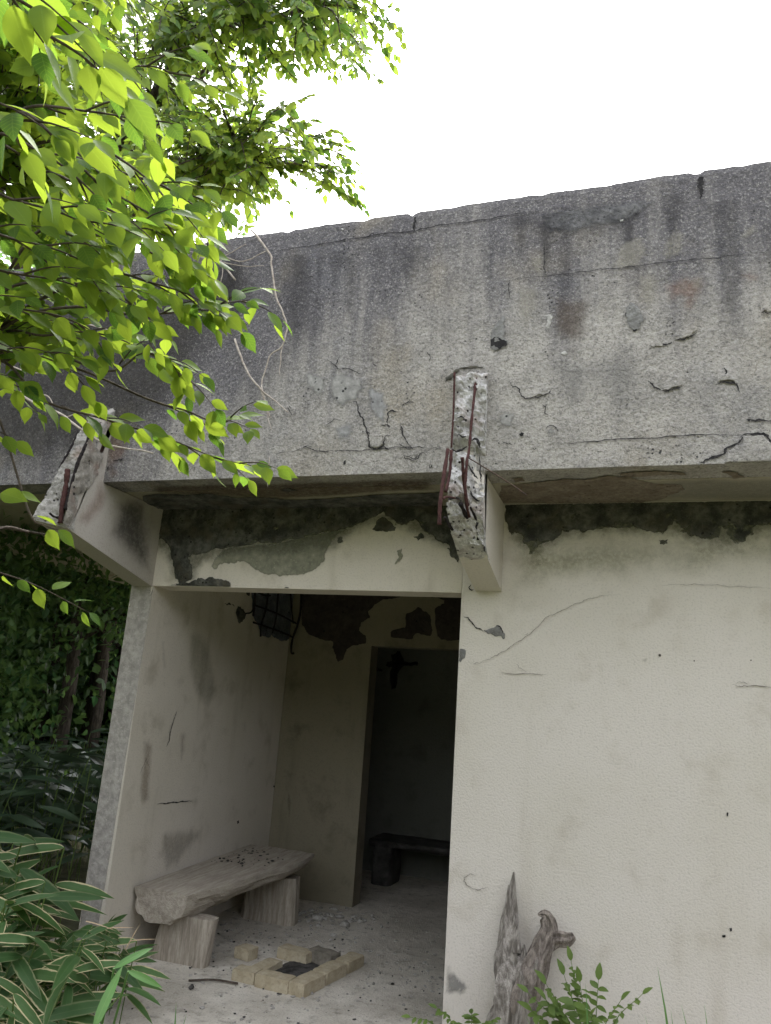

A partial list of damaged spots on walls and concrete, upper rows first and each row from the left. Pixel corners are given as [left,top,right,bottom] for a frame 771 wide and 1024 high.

crack [696,177,704,199]
spalling [490,316,508,350]
spalling [33,408,115,530]
crack [271,401,441,468]
crack [503,380,771,463]
peeling [143,365,771,662]
crack [466,595,607,675]